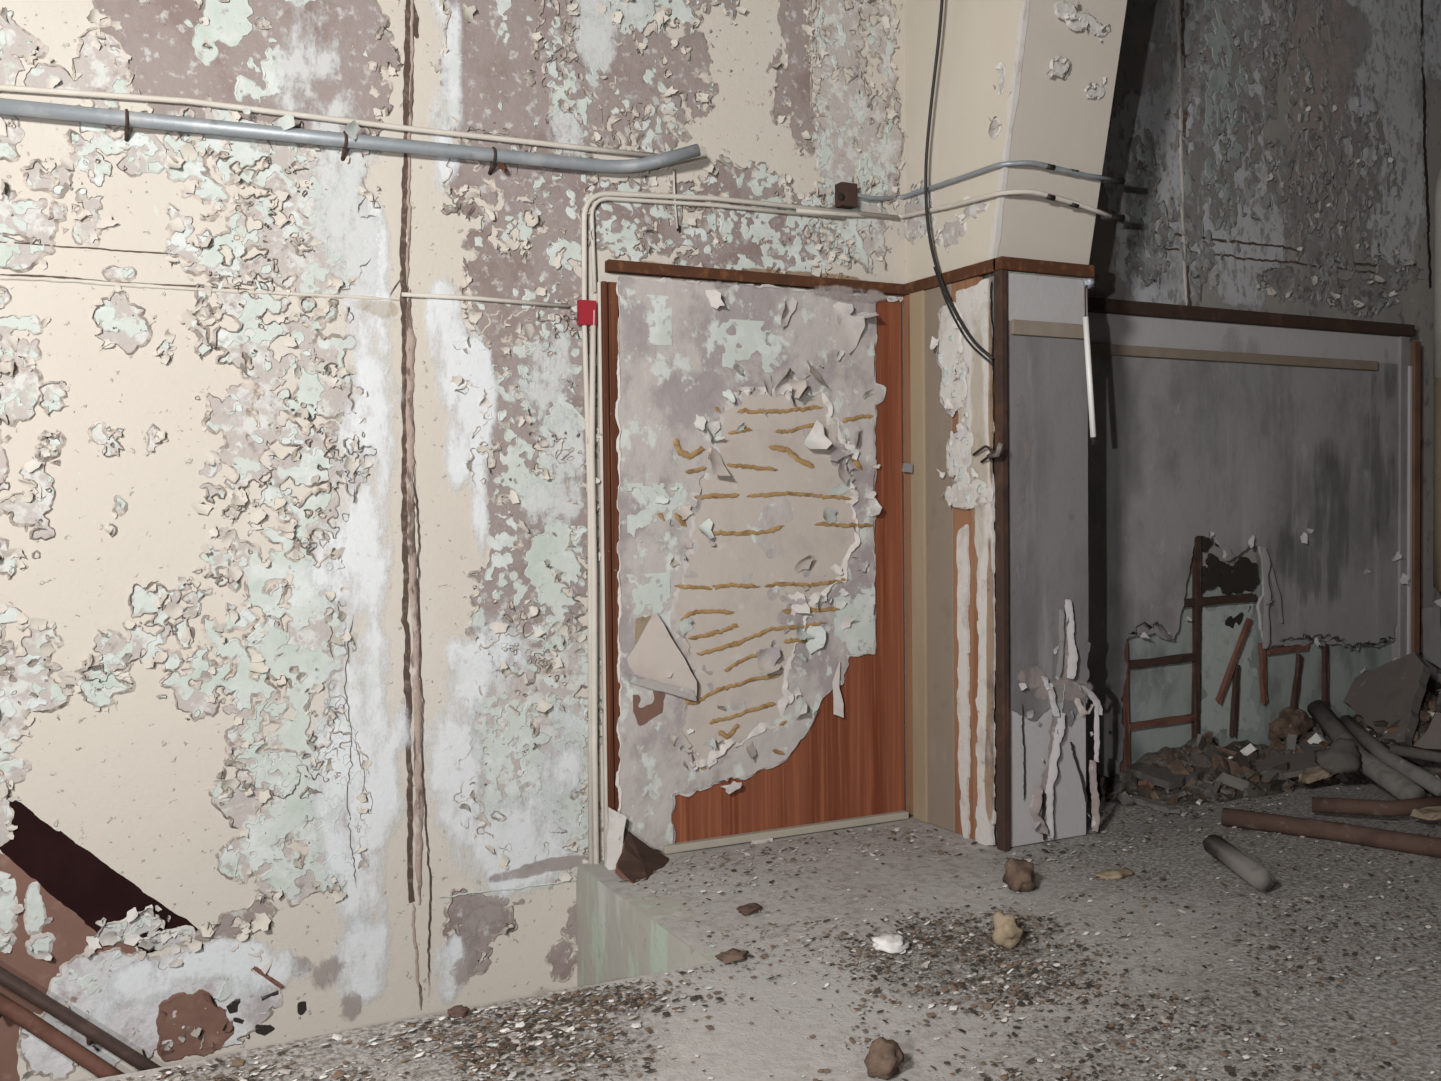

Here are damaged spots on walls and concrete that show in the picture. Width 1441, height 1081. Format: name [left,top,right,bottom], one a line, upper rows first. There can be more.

damp [1102,0,1441,312]
peeling [0,0,419,1081]
crack [0,0,577,1010]
peeling [770,1030,898,1081]
peeling [914,936,1081,1081]
peeling [1118,1034,1275,1081]
peeling [1203,922,1436,1042]